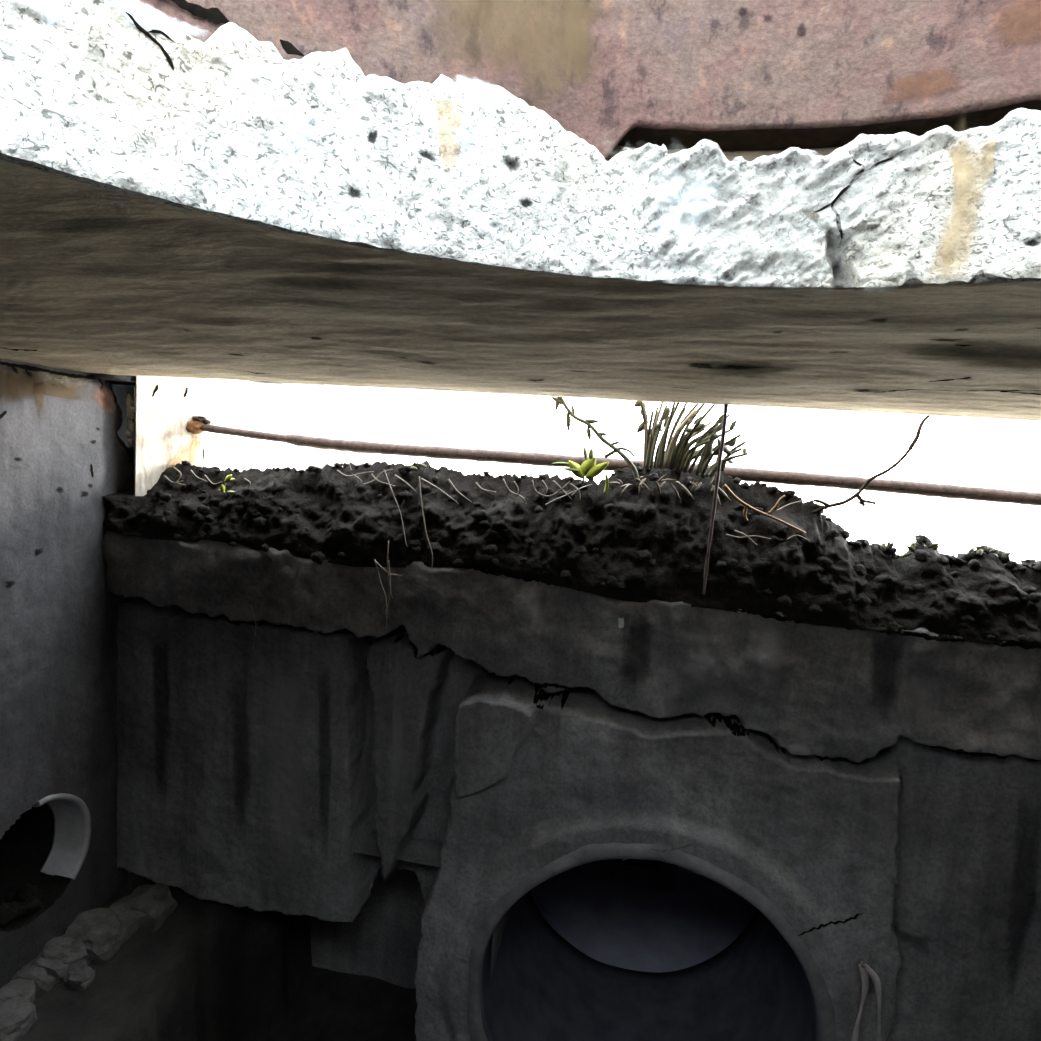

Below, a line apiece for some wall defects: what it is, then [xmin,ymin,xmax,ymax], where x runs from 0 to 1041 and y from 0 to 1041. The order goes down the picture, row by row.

peeling [112,0,194,35]
peeling [457,76,503,109]
spalling [505,157,518,170]
peeling [652,173,726,234]
spalling [804,209,826,227]
crack [798,149,906,248]
spalling [831,257,842,288]
crack [854,377,1041,395]
crack [797,912,864,936]